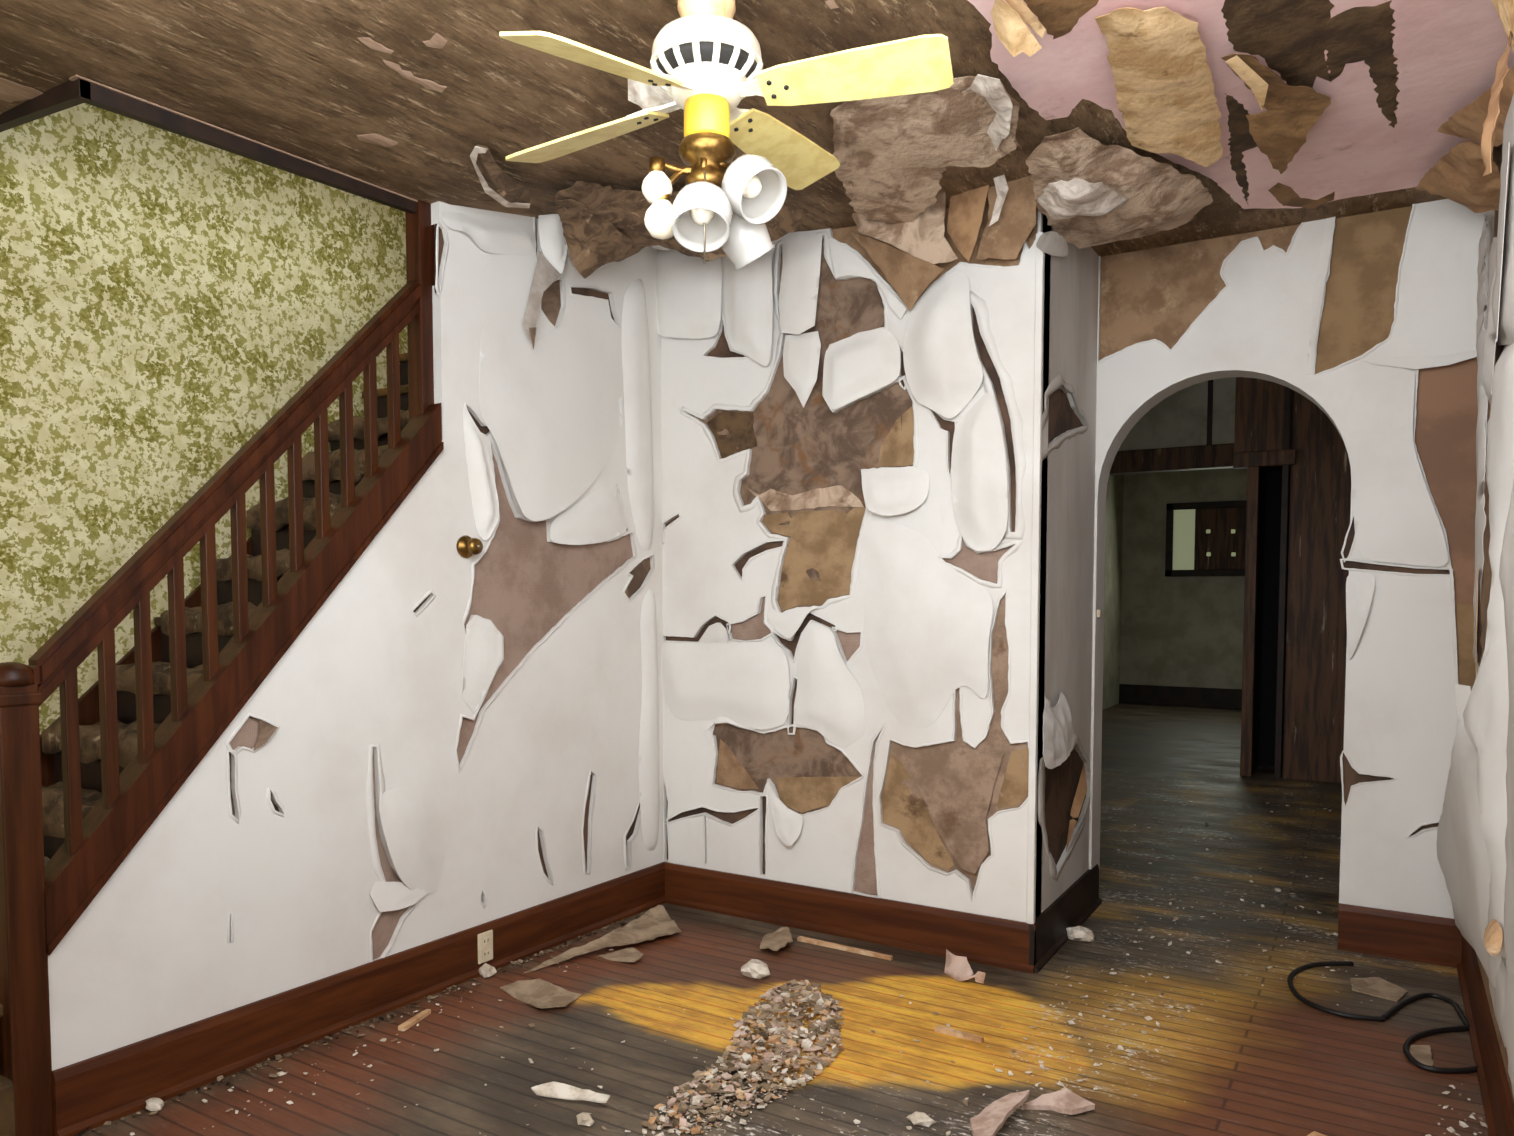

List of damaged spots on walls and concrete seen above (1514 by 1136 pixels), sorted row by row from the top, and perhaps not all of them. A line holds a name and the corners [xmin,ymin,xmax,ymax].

peeling [991,0,1099,57]
peeling [540,277,566,330]
peeling [678,200,1039,642]
peeling [1098,0,1487,690]
peeling [455,437,655,774]
peeling [703,534,1090,902]